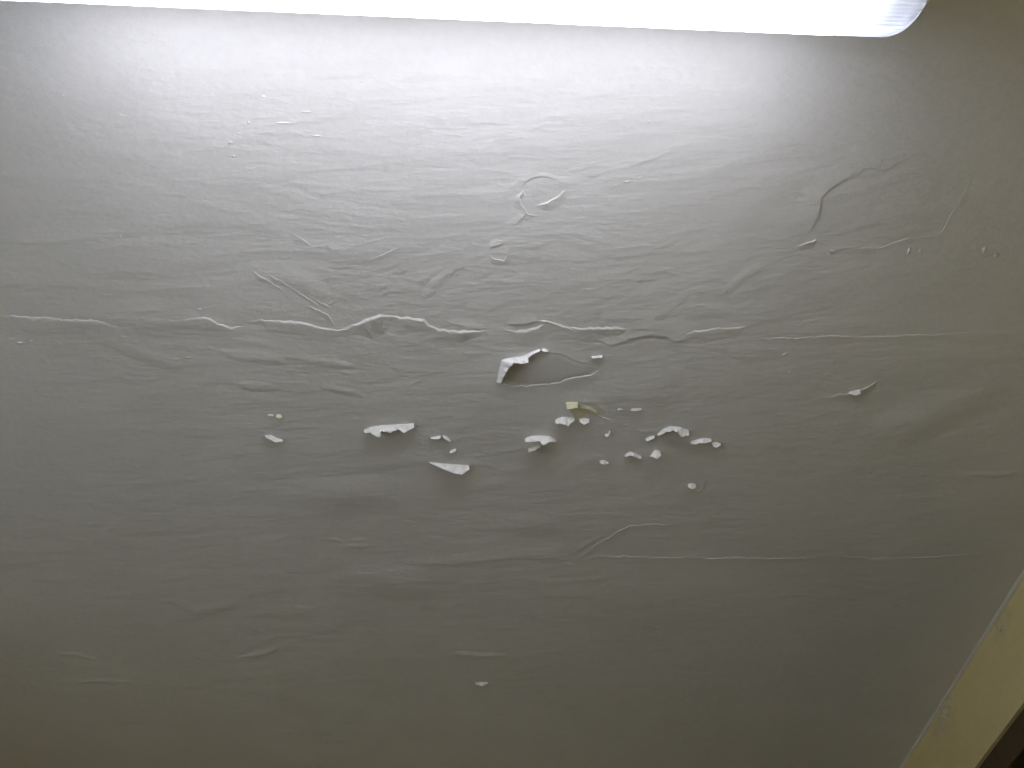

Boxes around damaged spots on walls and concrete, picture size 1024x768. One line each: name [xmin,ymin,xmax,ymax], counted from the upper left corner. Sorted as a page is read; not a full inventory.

peeling [496,342,642,437]
peeling [364,423,414,437]
peeling [430,435,469,475]
peeling [525,435,556,452]
peeling [625,426,721,459]